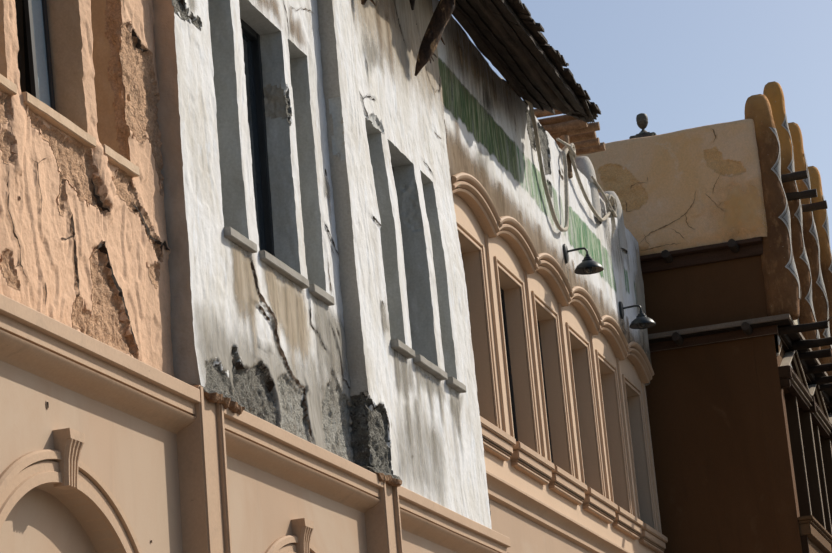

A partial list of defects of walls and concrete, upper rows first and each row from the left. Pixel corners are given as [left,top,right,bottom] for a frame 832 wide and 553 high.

spalling [172,0,202,31]
spalling [0,91,18,164]
spalling [104,0,164,196]
spalling [0,248,21,291]
crack [7,173,26,276]
spalling [26,105,163,289]
spalling [71,240,139,359]
spalling [205,346,311,443]
crack [231,254,314,440]
spalling [322,368,393,475]
water stain [395,351,462,487]
crack [641,177,726,251]